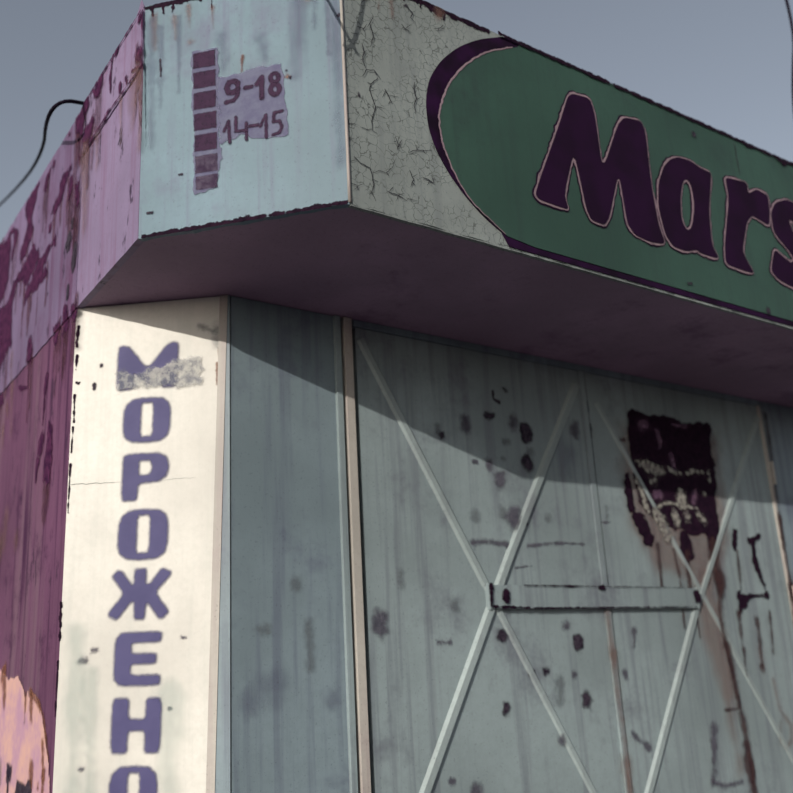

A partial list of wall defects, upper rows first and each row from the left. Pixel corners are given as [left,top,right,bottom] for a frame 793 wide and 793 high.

crack [348,0,436,201]
rust [403,0,793,166]
peeling [65,218,77,272]
rust [0,0,189,407]
rust [141,200,348,238]
peeling [70,381,80,453]
peeling [509,416,533,444]
peeling [564,622,584,651]
rust [489,408,757,793]
rust [732,529,769,637]
peeling [0,671,50,793]
peeling [582,691,591,708]